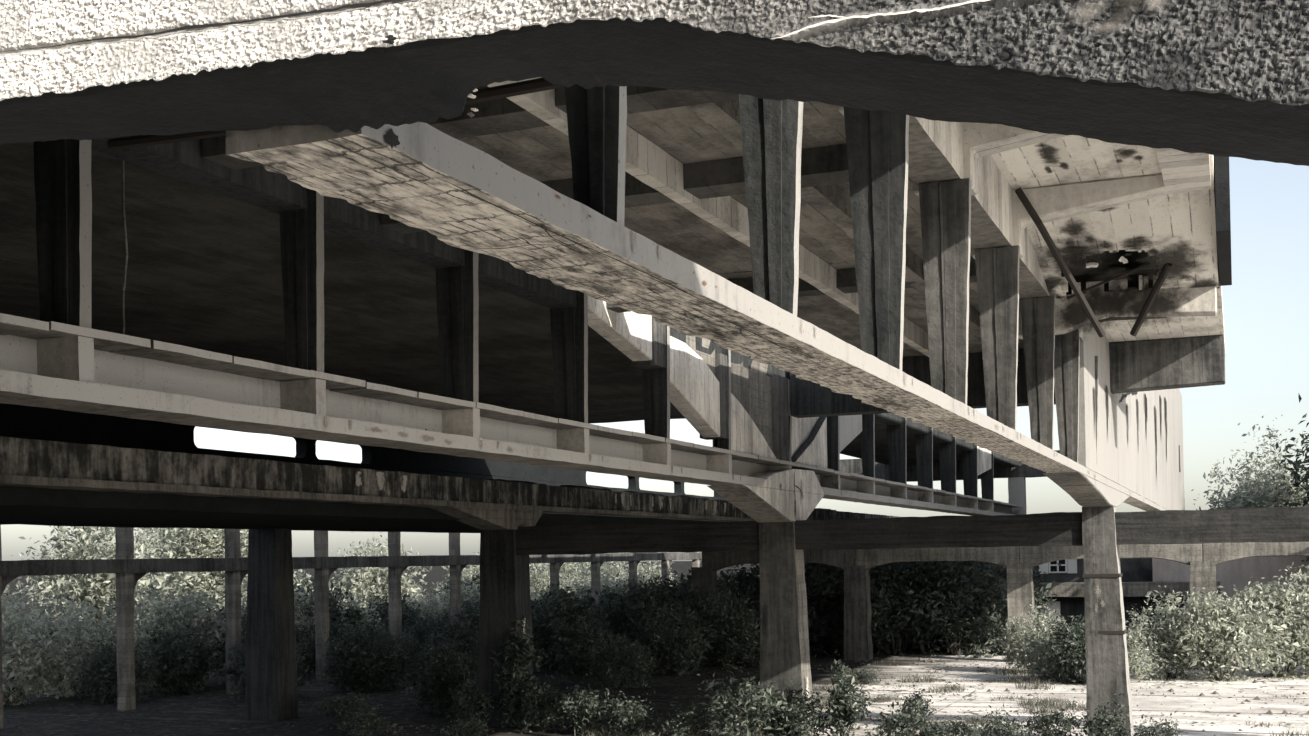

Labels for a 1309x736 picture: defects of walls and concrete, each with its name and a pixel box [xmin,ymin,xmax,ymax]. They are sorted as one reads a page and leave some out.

crack [772,0,989,39]
crack [1026,0,1060,38]
leakage [1038,144,1068,173]
leakage [1117,150,1142,163]
leakage [1039,221,1219,334]
leakage [1094,386,1109,438]